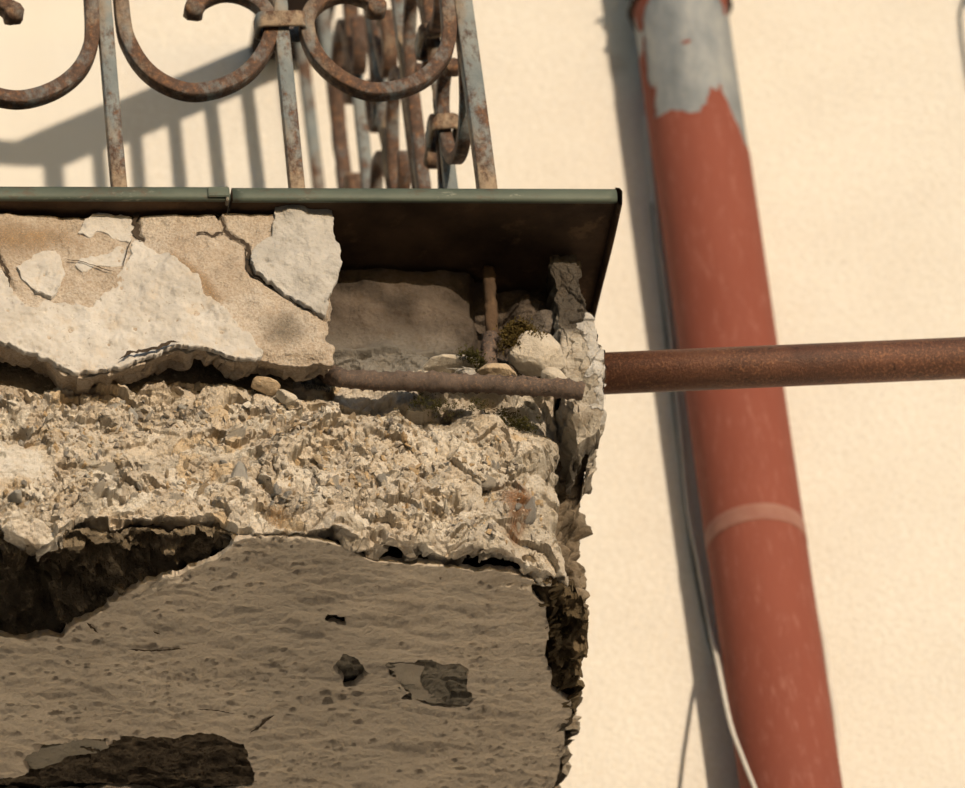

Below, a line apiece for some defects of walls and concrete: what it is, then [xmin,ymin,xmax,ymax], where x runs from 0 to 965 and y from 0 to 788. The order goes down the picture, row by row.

spalling [0,213,607,788]